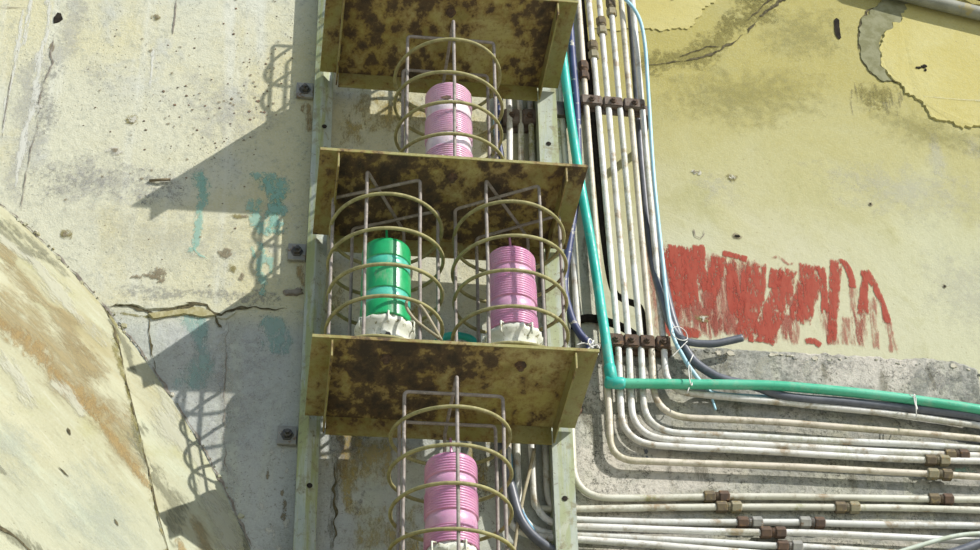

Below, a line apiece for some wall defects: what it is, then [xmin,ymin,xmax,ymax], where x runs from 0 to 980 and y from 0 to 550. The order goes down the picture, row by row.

crack [2,0,63,205]
crack [641,0,786,76]
crack [858,1,903,88]
flaking render [879,3,980,130]
crack [102,299,287,550]
crack [0,525,43,550]